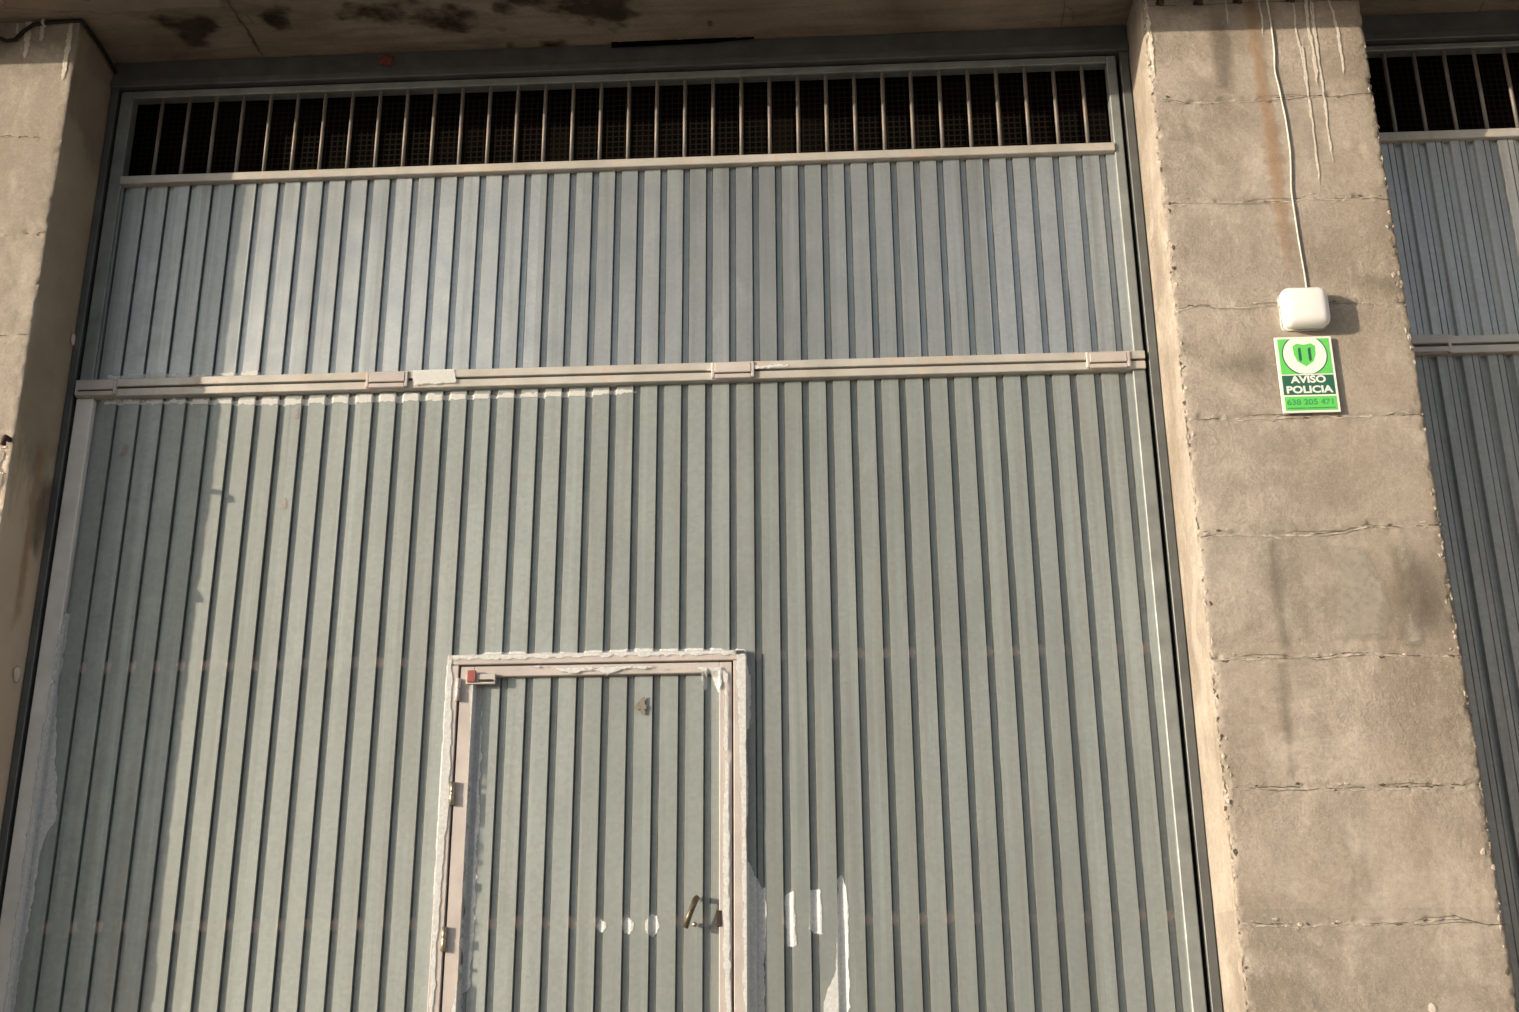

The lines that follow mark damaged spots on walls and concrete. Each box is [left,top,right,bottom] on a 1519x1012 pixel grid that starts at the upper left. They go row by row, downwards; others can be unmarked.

leakage [353,0,472,32]
leakage [494,0,638,21]
leakage [3,0,221,79]